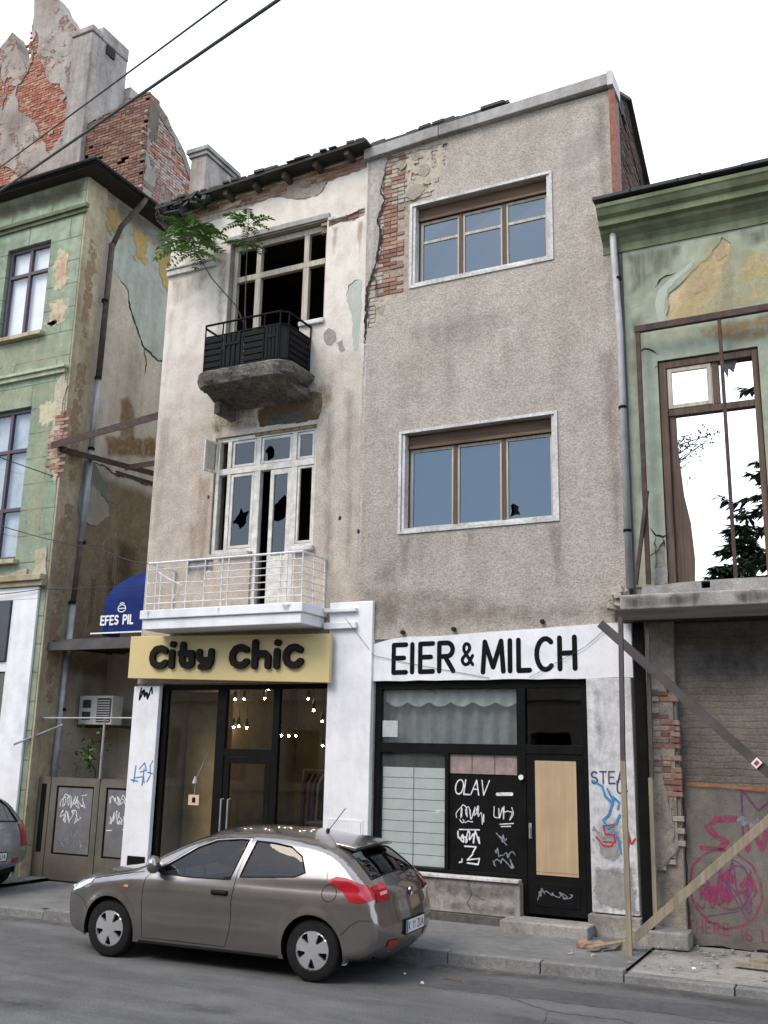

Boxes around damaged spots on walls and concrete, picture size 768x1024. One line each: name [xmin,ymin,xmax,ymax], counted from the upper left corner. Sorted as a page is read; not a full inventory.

flaking render [0,31,67,186]
flaking render [140,117,190,199]
peeling [44,248,74,328]
crack [120,280,163,372]
peeling [79,154,367,360]
crack [330,157,386,380]
flaking render [323,147,447,352]
peeling [655,239,731,322]
flaking render [37,362,116,504]
peeling [0,504,73,704]
flaking render [646,678,686,872]